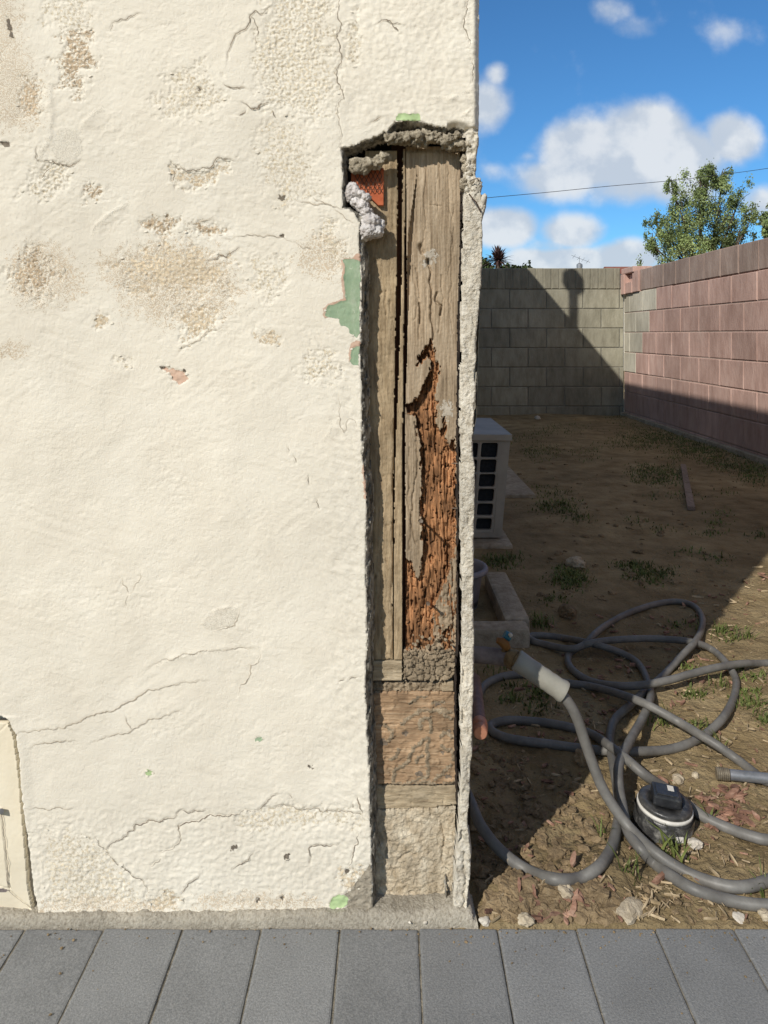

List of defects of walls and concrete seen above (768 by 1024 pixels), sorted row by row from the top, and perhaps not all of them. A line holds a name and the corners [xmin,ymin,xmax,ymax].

crack [227,6,270,58]
crack [225,85,274,116]
crack [336,2,344,144]
peeling [159,365,188,384]
spalling [235,112,464,910]
crack [13,614,260,748]
crack [96,795,368,891]